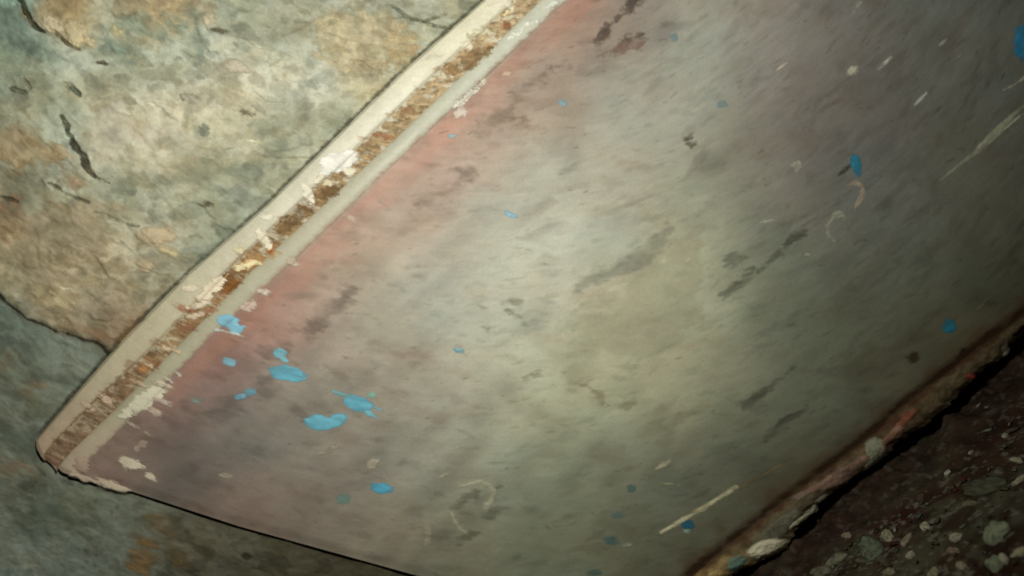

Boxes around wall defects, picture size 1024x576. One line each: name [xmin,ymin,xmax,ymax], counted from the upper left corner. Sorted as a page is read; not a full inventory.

flaking render [313,11,440,74]
peeling [460,0,559,50]
peeling [453,79,486,118]
flaking render [0,124,71,174]
crack [48,86,109,203]
peeling [301,148,358,205]
peeling [255,213,274,250]
peeling [182,249,263,319]
peeling [240,289,271,312]
peeling [0,297,416,576]